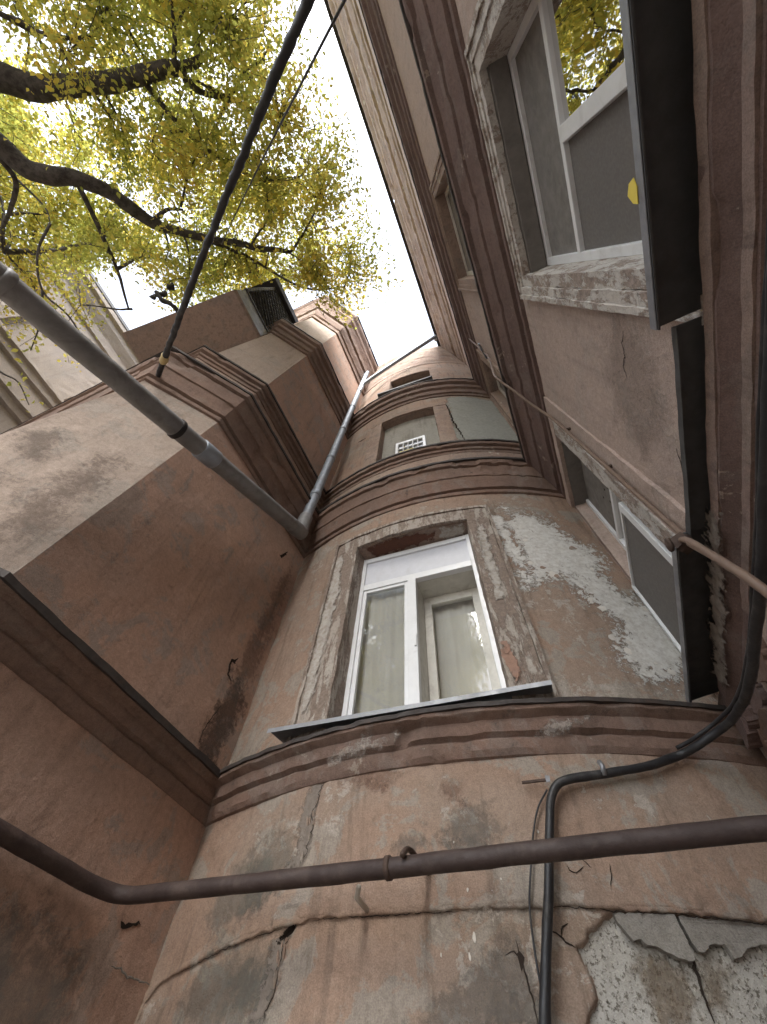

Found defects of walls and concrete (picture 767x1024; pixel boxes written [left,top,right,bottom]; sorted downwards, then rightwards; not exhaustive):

peeling [301,555,344,714]
peeling [367,503,684,696]
peeling [701,507,729,689]
crack [567,860,612,885]
crack [506,941,538,1024]
crack [553,923,576,948]
flaking render [578,912,767,1024]